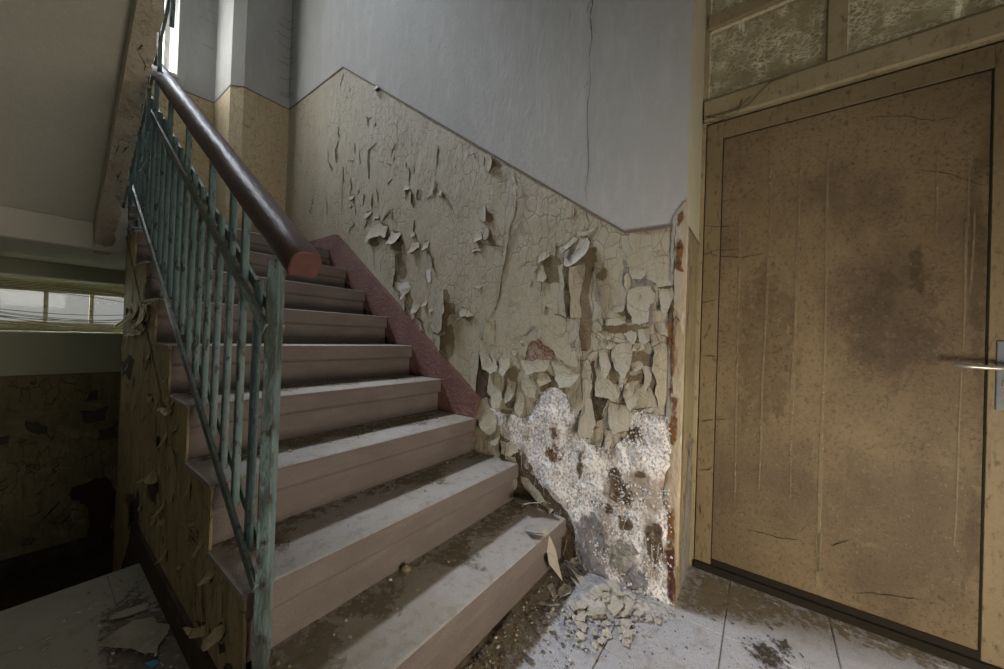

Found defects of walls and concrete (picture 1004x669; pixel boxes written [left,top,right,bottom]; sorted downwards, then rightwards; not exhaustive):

peeling [327,129,474,360]
corrosion [675,240,684,272]
peeling [112,277,151,388]
peeling [470,201,689,599]
spalling [69,436,192,545]
damp [490,387,674,605]
peeling [183,567,232,669]
peeling [547,600,661,650]